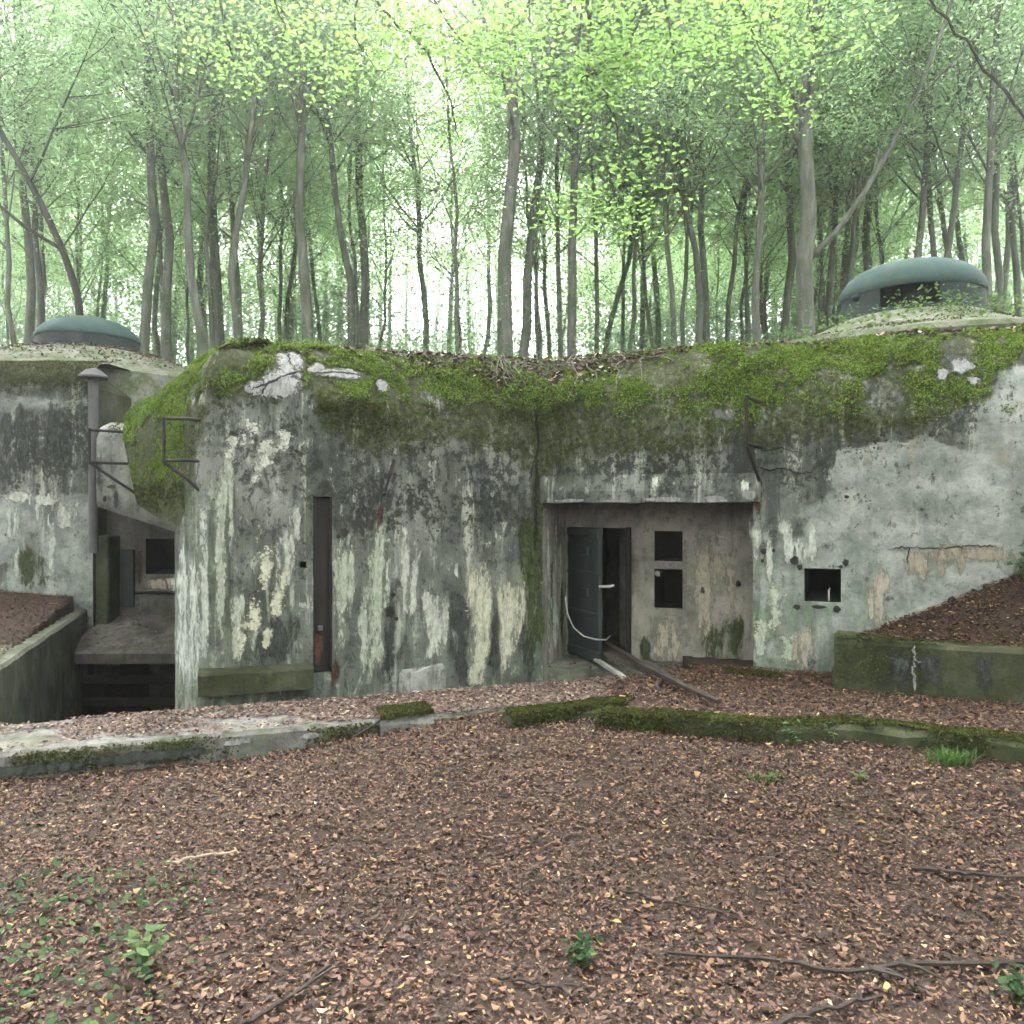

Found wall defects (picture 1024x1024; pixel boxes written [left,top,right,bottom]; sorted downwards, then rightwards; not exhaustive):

spalling [244,352,361,401]
spalling [376,379,389,392]
spalling [938,358,980,385]
leakage [1,401,74,462]
crack [757,447,811,474]
leakage [6,493,56,589]
leakage [146,439,245,688]
leakage [255,505,301,663]
leakage [332,516,564,687]
crack [888,544,1000,565]
rust [312,632,340,685]
crack [911,645,921,692]